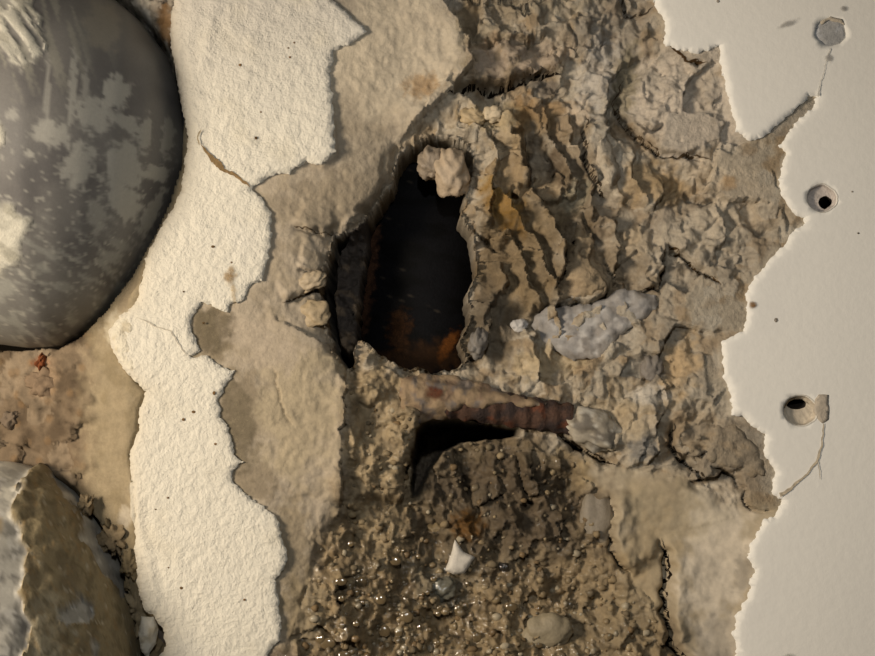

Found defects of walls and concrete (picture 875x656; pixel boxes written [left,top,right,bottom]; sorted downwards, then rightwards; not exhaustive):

crack [663,38,705,66]
crack [448,72,561,99]
crack [611,80,711,160]
crack [197,130,250,187]
crack [581,118,604,198]
crack [640,243,720,291]
rust [380,312,462,372]
spalling [191,0,816,656]
rust [427,387,442,398]
crack [668,423,706,480]
crack [661,538,686,656]